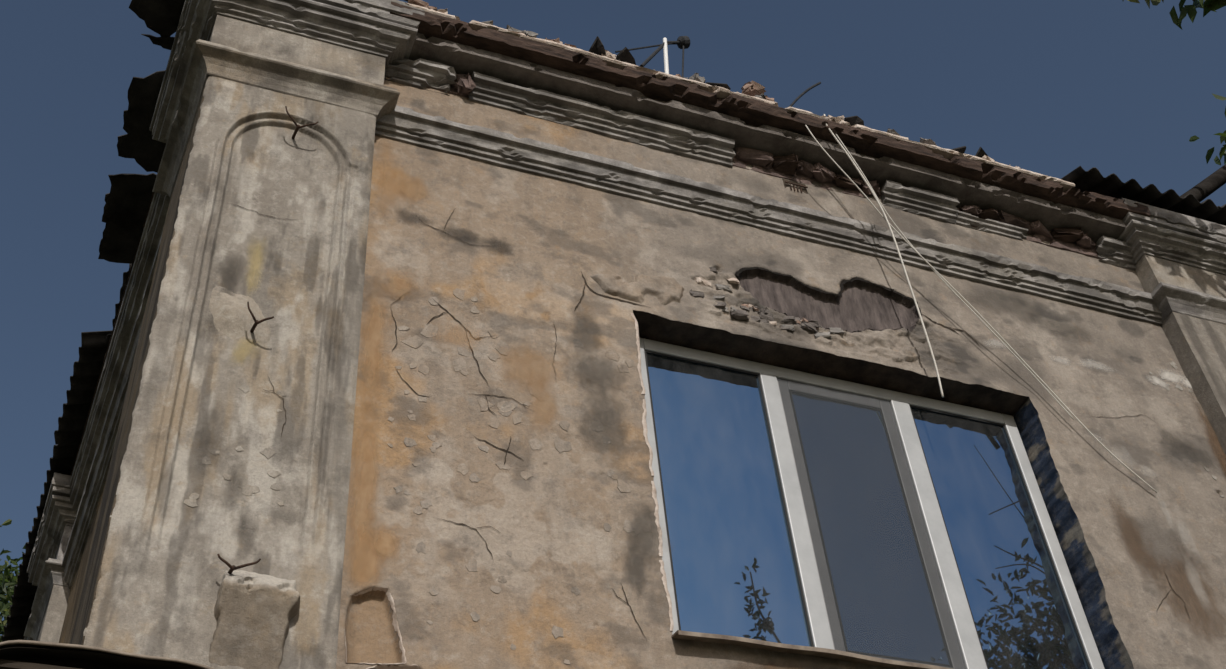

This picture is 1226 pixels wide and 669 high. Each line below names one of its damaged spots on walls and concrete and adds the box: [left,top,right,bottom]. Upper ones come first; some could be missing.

flaking render [959,205,1096,250]
spalling [689,267,922,339]
spalling [631,313,674,632]
spalling [345,586,419,669]